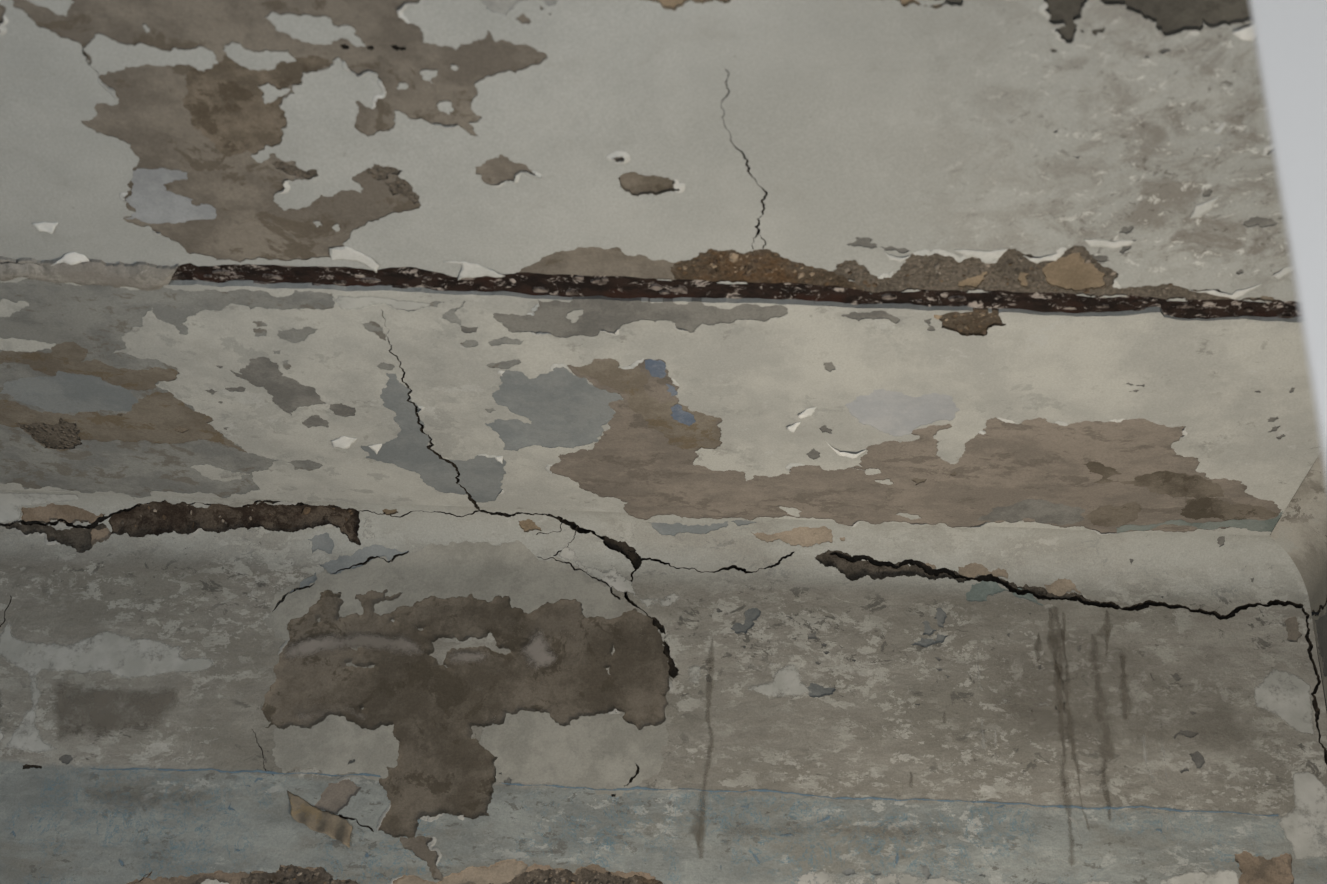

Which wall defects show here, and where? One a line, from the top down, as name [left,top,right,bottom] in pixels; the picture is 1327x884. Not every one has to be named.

peeling [0,0,557,273]
spalling [605,151,685,196]
crack [721,69,768,249]
spalling [443,226,1293,302]
crack [0,309,794,618]
peeling [0,278,1281,607]
peeling [261,519,679,884]
damp [749,665,809,696]
crack [830,552,1327,765]
spalling [126,864,358,884]
crack [339,814,374,832]
spalling [1235,851,1295,884]